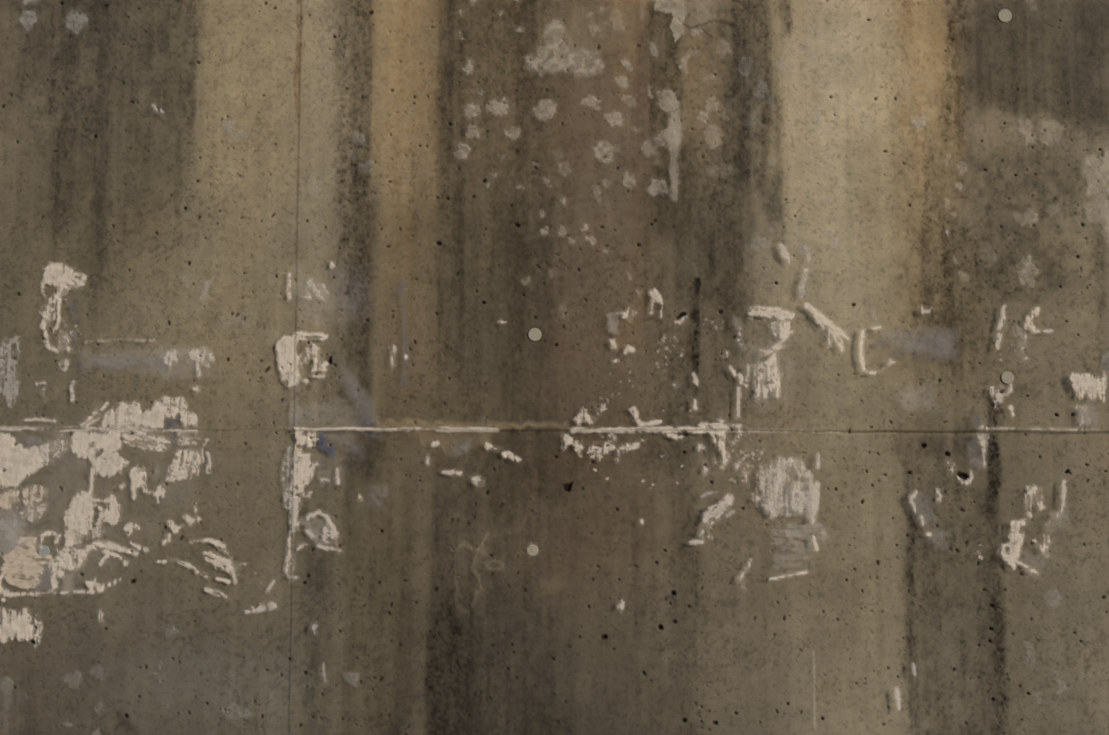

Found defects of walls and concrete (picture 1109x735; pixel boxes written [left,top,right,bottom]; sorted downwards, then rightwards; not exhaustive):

peeling [40,263,86,371]
water stain [19,0,126,255]
peeling [0,349,215,647]
peeling [157,538,245,598]
peeling [276,331,332,387]
peeling [282,419,547,579]
water stain [425,501,572,735]
water stain [435,0,784,497]
peeling [649,288,663,318]
peeling [563,404,801,482]
water stain [909,0,1109,375]
peeling [1070,371,1107,425]